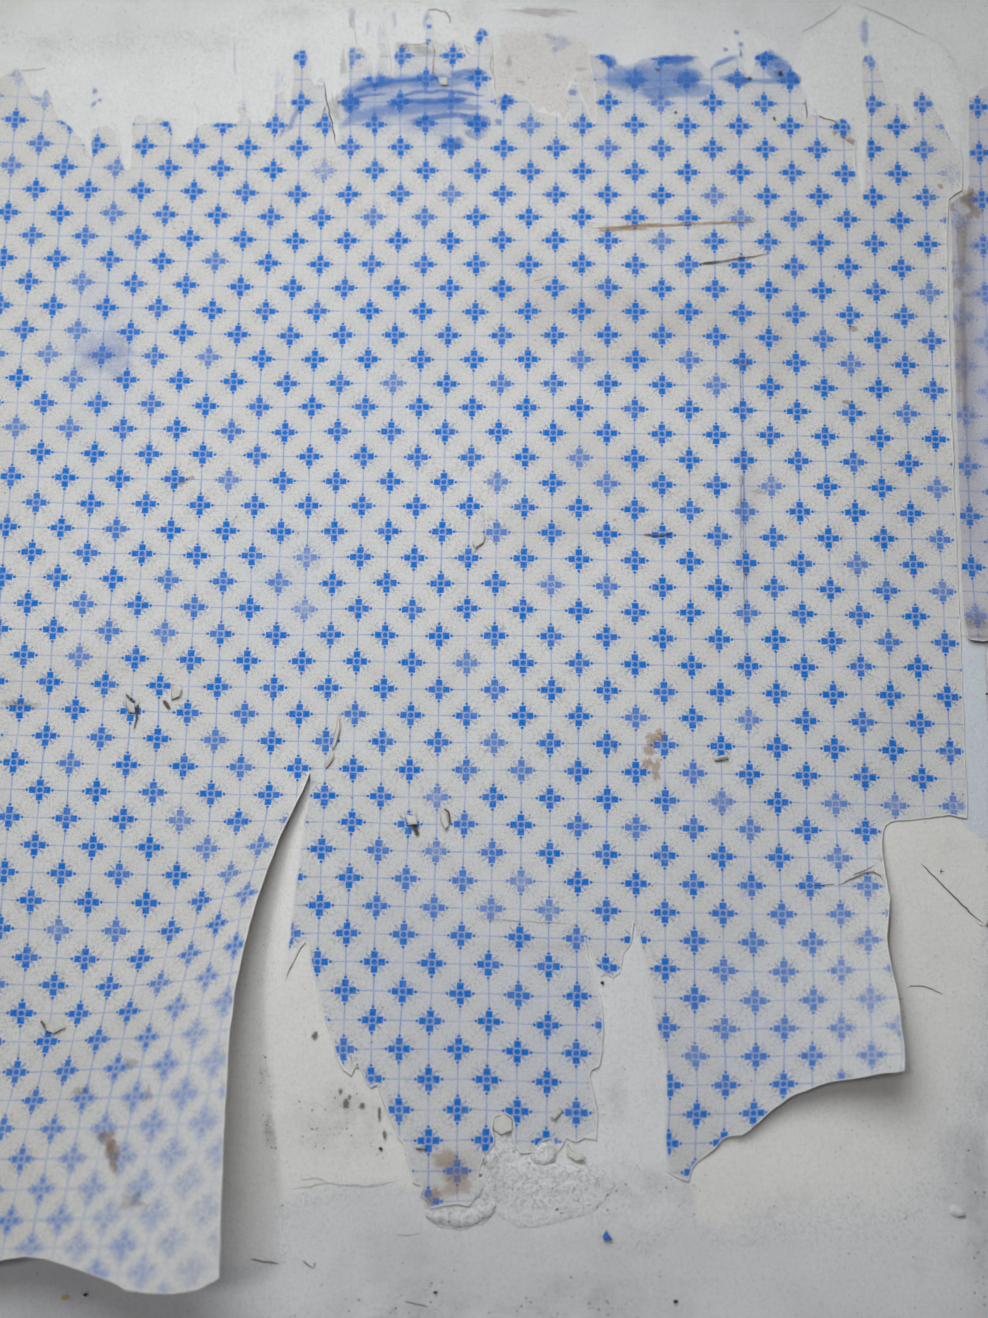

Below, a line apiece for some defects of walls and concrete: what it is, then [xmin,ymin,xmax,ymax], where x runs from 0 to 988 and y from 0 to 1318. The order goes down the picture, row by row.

peeling [0,0,494,169]
peeling [713,3,968,203]
peeling [0,714,988,1294]